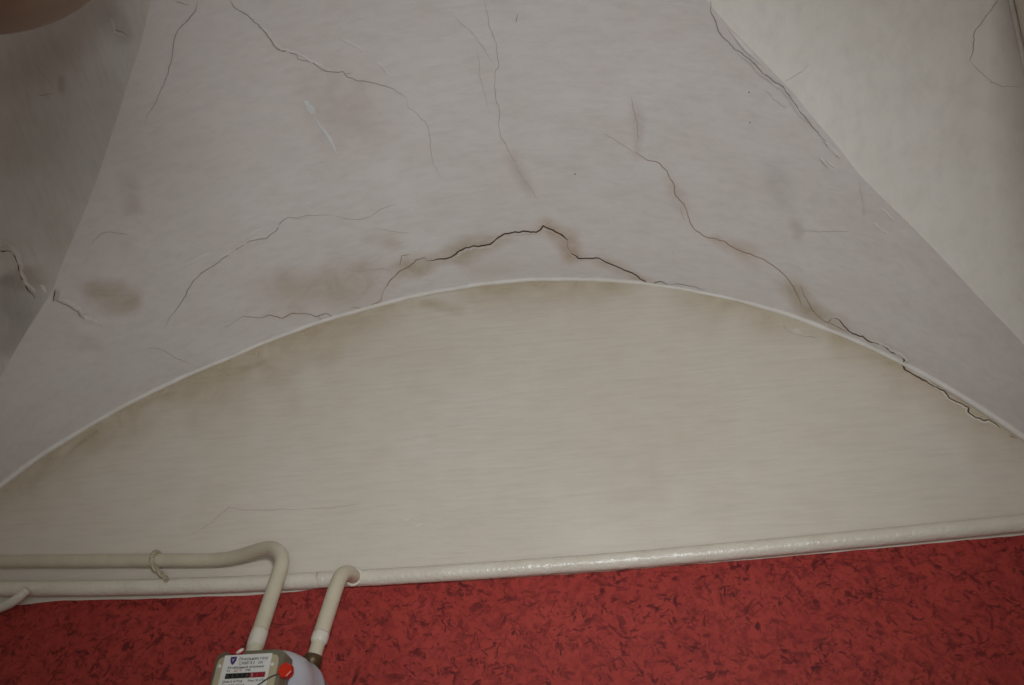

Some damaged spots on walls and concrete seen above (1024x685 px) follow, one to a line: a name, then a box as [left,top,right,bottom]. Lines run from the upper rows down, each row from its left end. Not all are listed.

crack [146,0,198,118]
crack [231,2,440,176]
crack [710,2,826,142]
crack [154,205,704,363]
crack [605,101,1015,438]